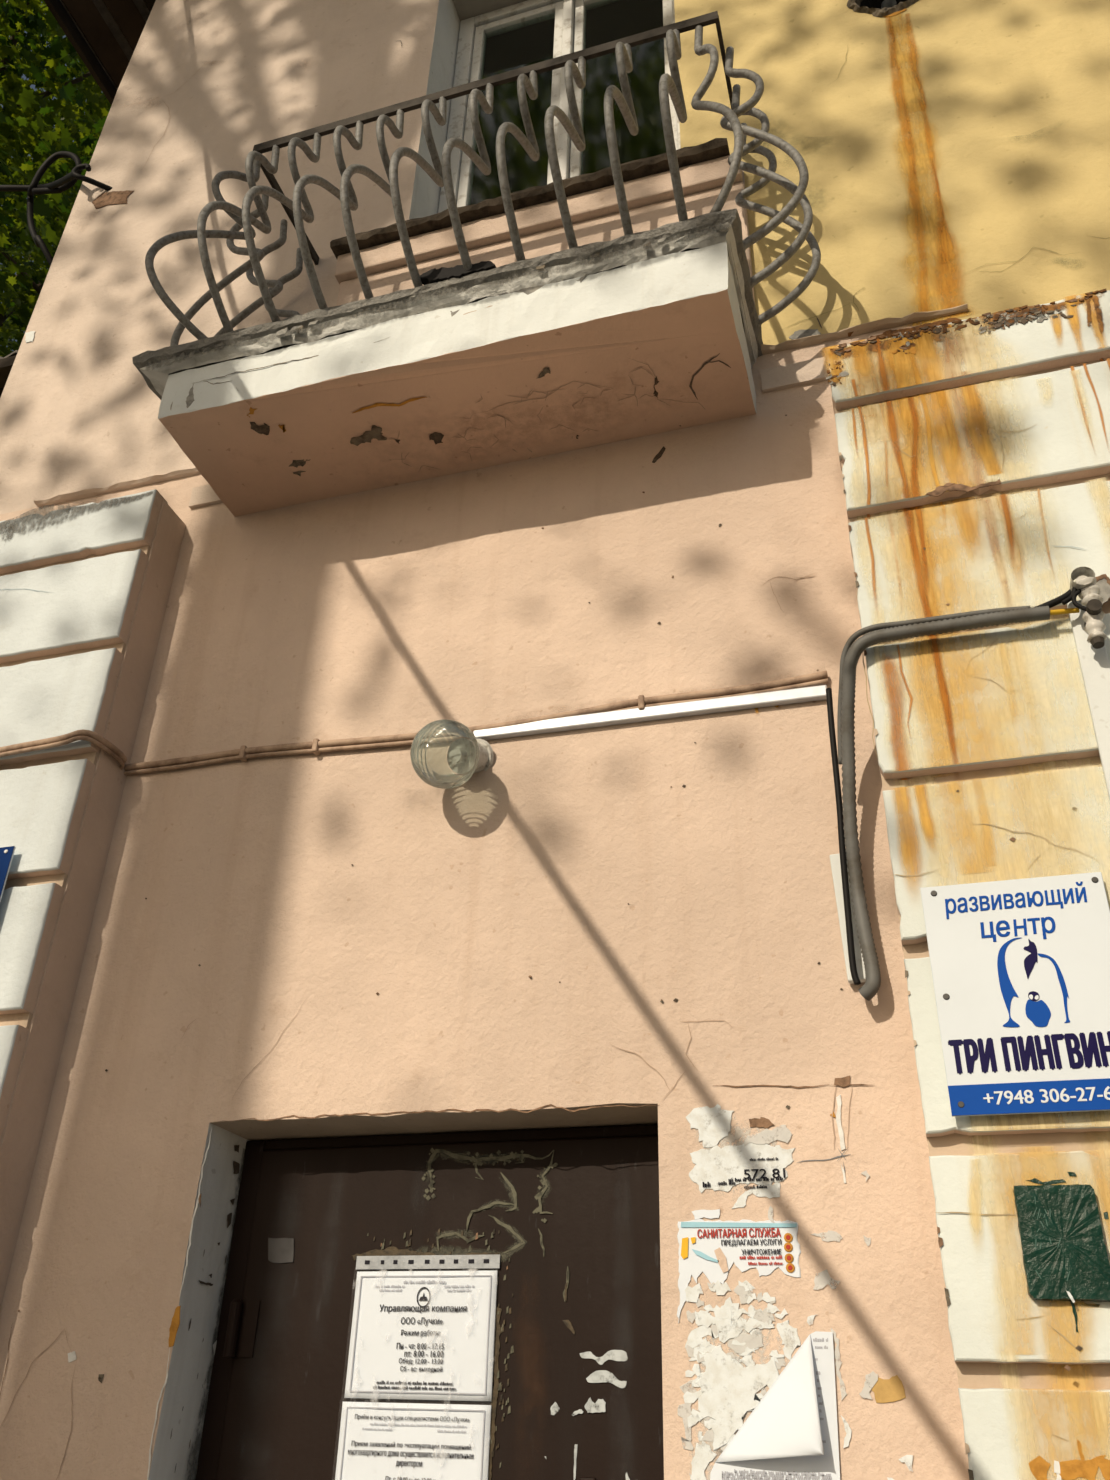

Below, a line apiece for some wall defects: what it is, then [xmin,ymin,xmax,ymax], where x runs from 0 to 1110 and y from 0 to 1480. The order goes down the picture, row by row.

spalling [789,289,1107,386]
peeling [247,407,286,435]
peeling [350,425,400,446]
peeling [429,432,444,444]
spalling [926,479,1001,497]
corrosion [825,13,1110,909]
crack [614,1020,732,1099]
corrosion [970,1113,1057,1238]
corrosion [1091,1110,1110,1228]
peeling [859,1375,906,1403]
corrosion [1050,1300,1108,1453]
peeling [1028,1440,1110,1480]